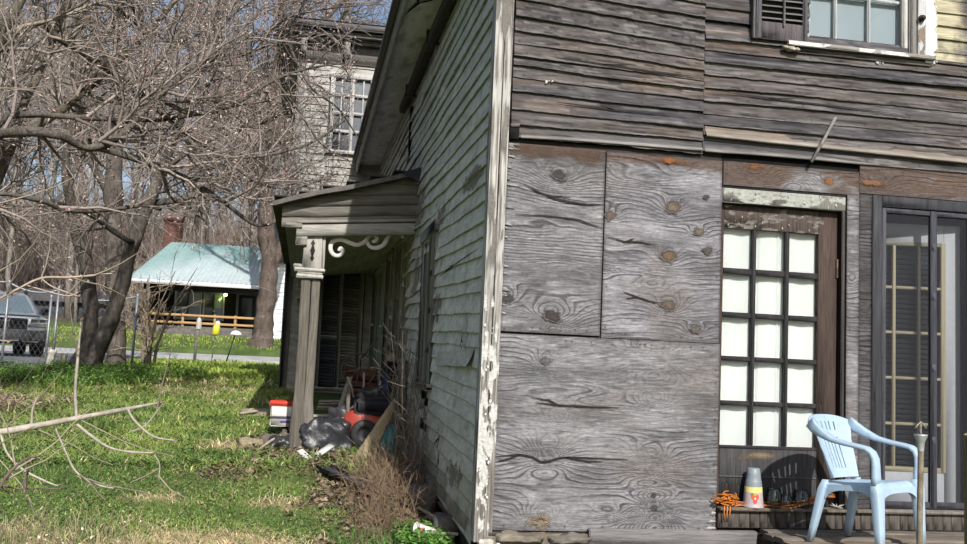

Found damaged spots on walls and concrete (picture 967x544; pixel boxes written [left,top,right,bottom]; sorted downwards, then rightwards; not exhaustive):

peeling [497,0,514,53]
peeling [463,84,520,276]
peeling [724,188,845,234]
peeling [446,287,511,544]